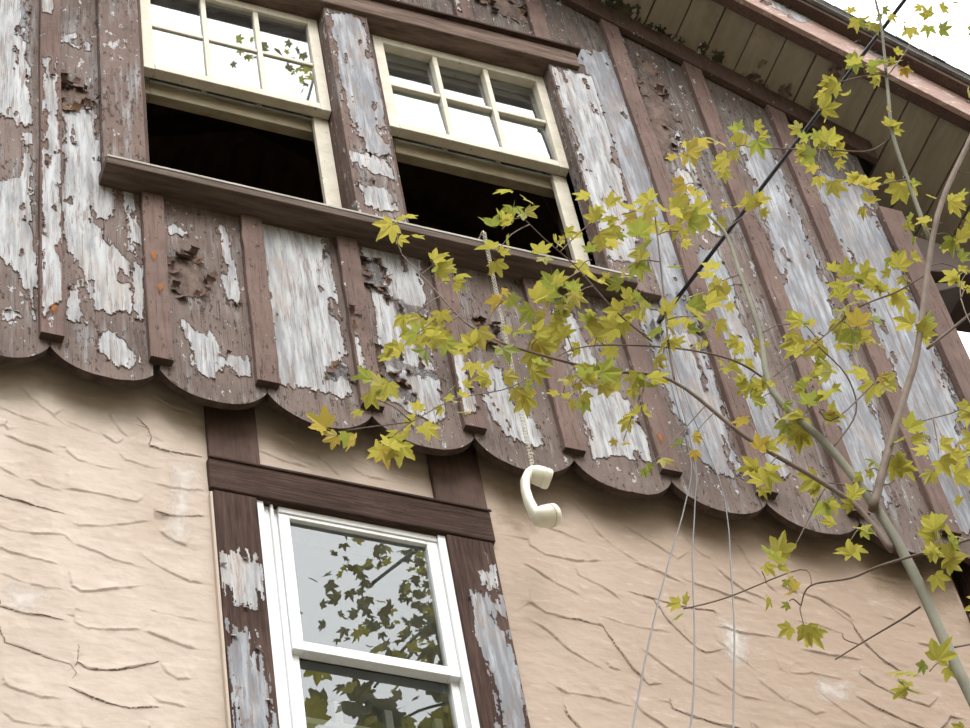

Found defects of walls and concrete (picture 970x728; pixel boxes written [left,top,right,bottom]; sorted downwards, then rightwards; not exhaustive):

peeling [0,0,145,325]
peeling [165,221,243,306]
peeling [180,318,252,380]
peeling [326,9,399,213]
peeling [262,224,549,448]
peeling [551,48,744,480]
peeling [633,56,793,485]
peeling [731,125,901,510]
peeling [812,170,970,535]
peeling [219,547,265,610]
peeling [225,617,278,728]
peeling [469,564,528,728]